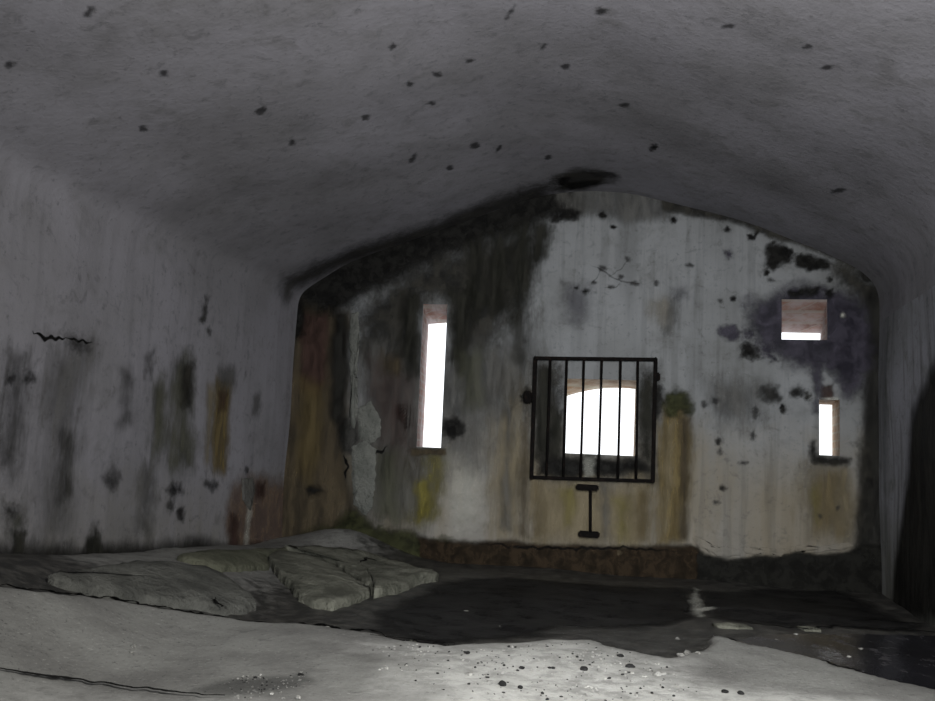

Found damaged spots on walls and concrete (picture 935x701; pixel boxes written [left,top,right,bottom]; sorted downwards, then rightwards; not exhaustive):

damp [154,356,193,468]
damp [282,193,663,537]
damp [702,241,881,548]